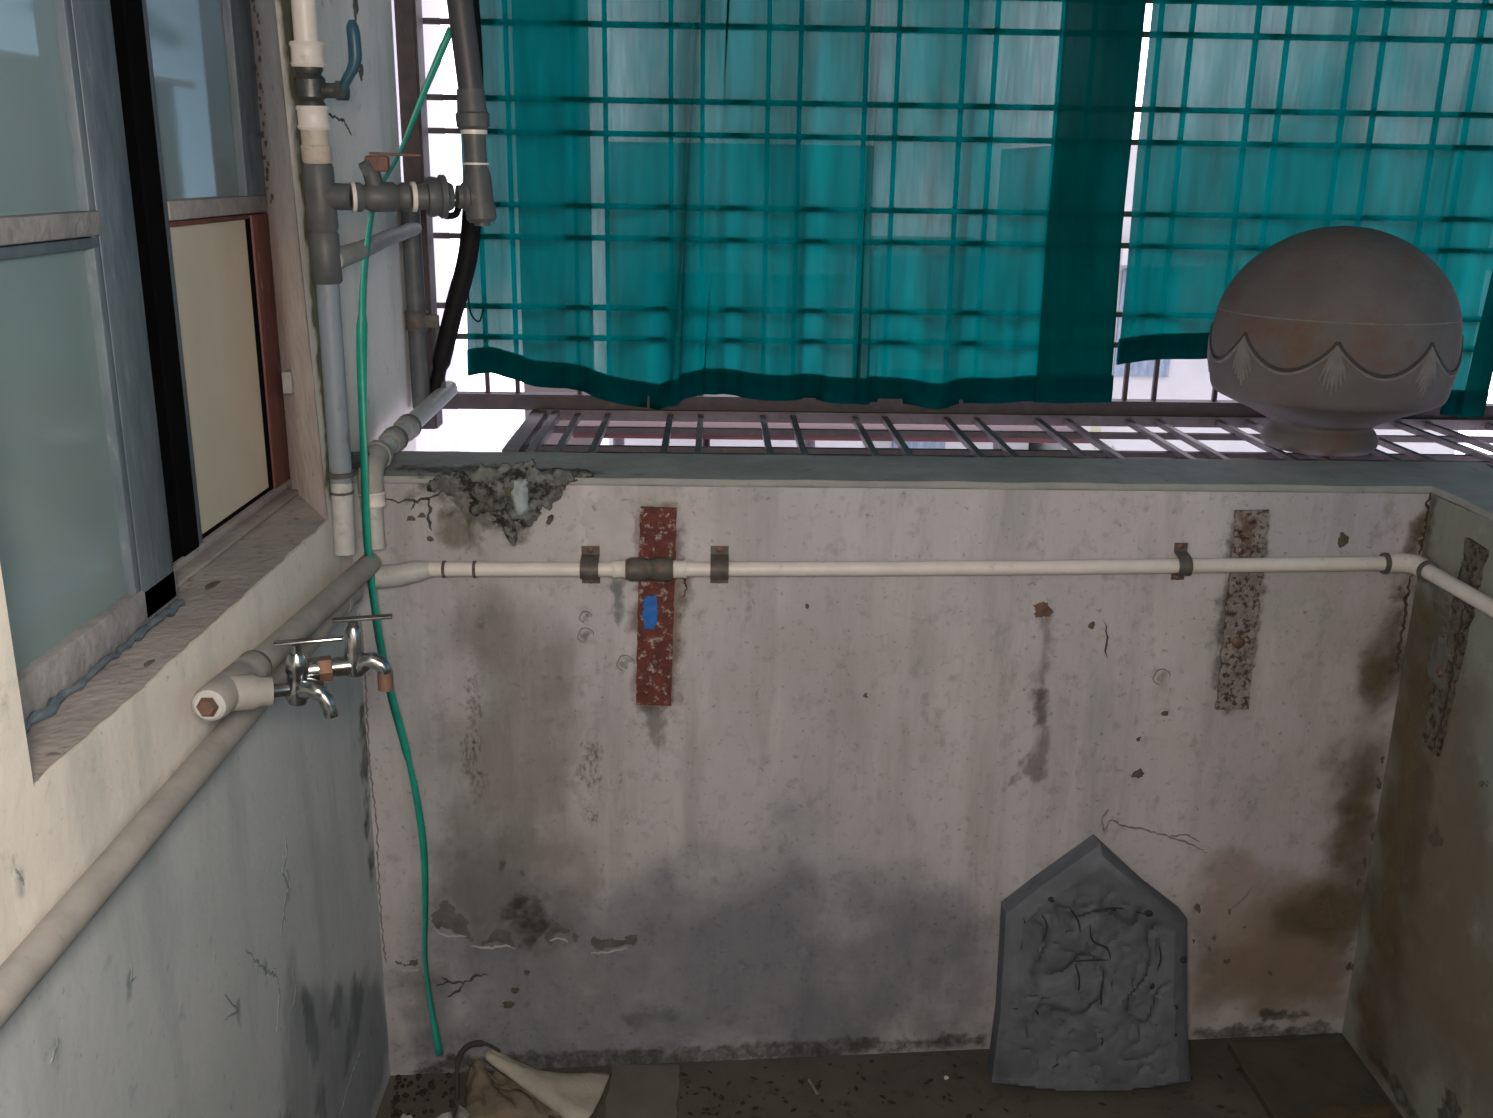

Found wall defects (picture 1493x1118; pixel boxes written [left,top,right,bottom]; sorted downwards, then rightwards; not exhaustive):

spalling [423,459,594,546]
leakage [1192,602,1493,1115]
peeling [431,901,515,950]
peeling [544,922,637,954]